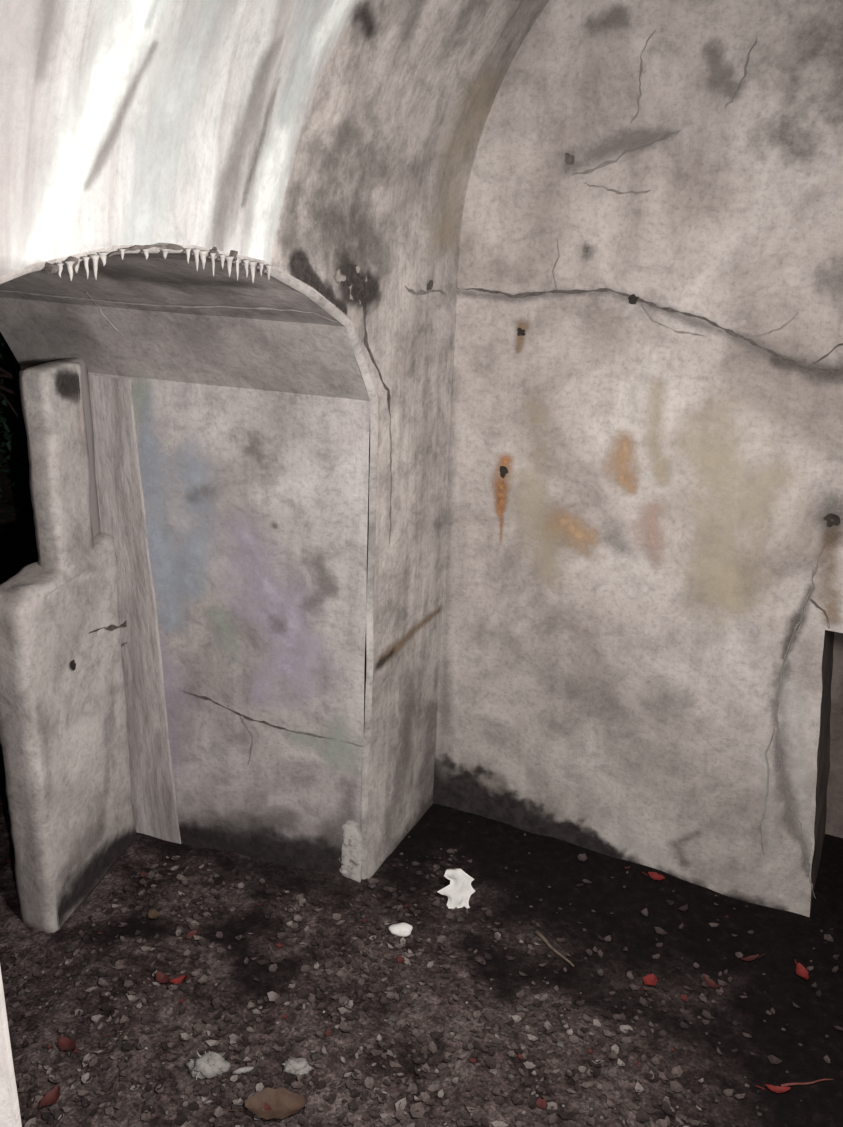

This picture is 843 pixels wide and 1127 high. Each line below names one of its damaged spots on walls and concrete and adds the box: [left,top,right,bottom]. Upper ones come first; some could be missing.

damp [13,0,198,287]
crack [405,240,843,380]
crack [363,306,392,544]
corrosion [494,456,511,537]
corrosion [377,608,440,668]
crack [180,690,359,764]
damp [386,703,639,864]